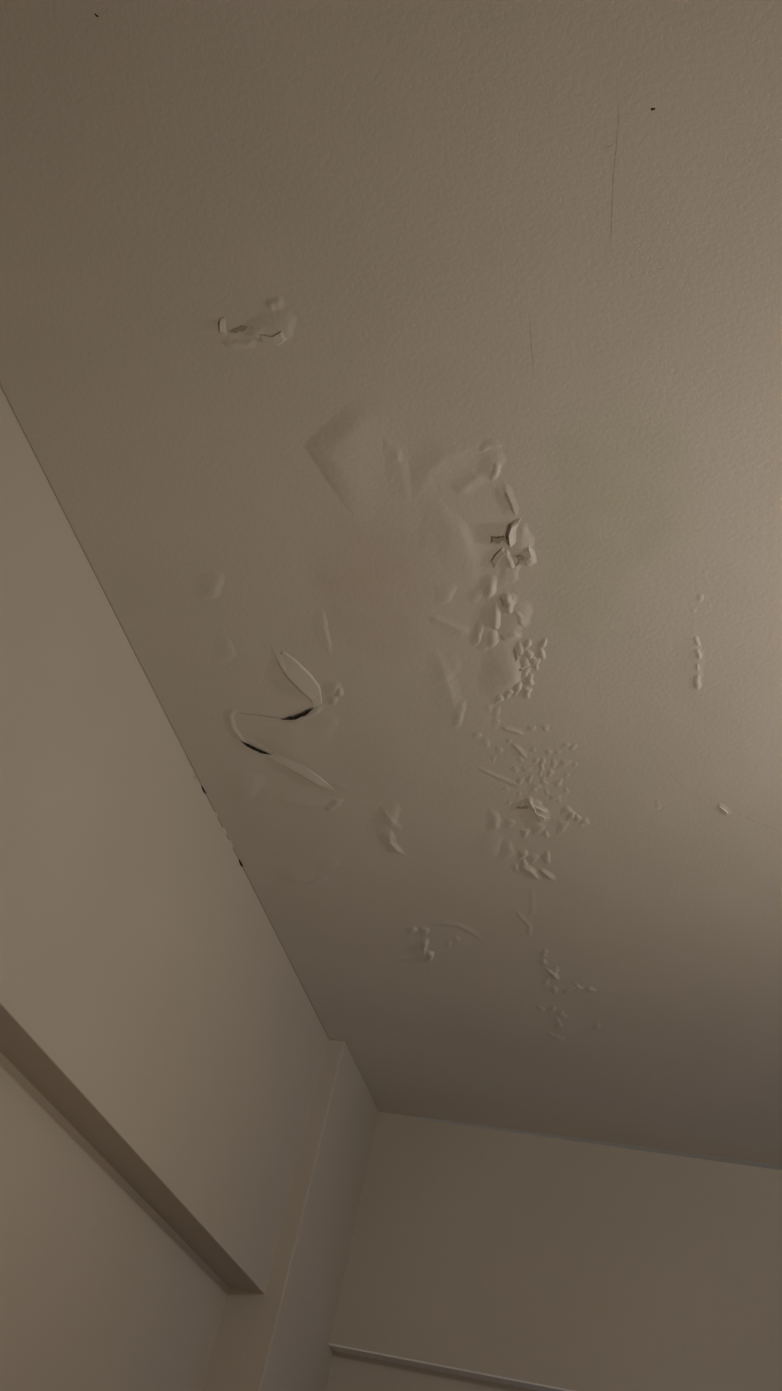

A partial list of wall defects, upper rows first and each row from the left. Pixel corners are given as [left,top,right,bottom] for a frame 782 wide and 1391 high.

peeling [469,478,548,705]